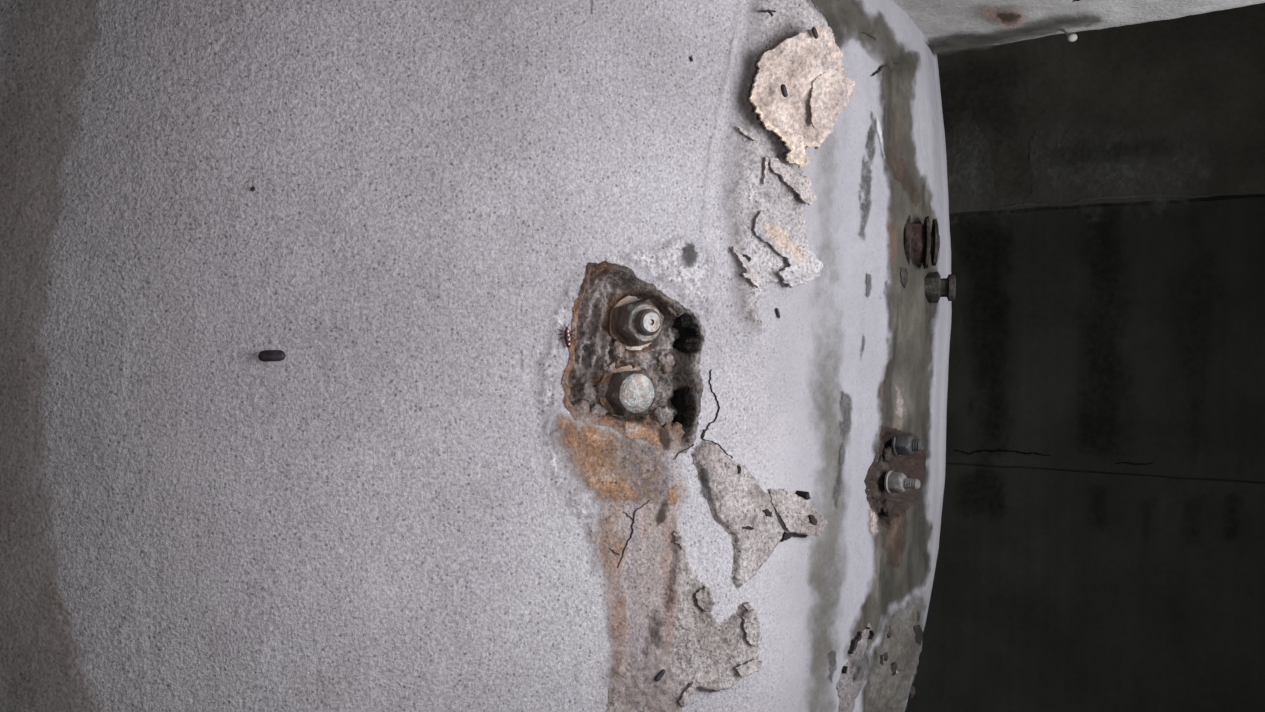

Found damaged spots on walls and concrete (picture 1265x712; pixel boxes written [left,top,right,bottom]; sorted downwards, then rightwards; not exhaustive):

peeling [731,0,855,328]
water stain [0,0,94,712]
rust [560,417,686,695]
spalling [539,238,828,712]
crack [672,369,733,460]
spalling [836,596,927,712]
water stain [811,0,1101,712]